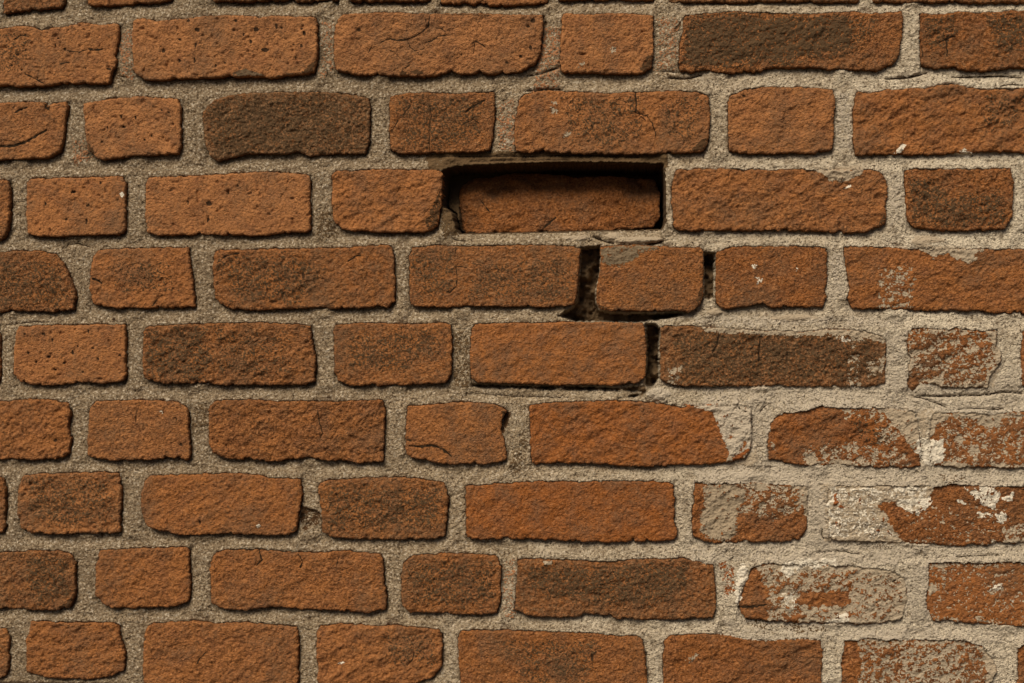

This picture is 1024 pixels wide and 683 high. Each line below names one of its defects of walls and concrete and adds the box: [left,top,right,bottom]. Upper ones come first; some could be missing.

damp [740,617,828,635]